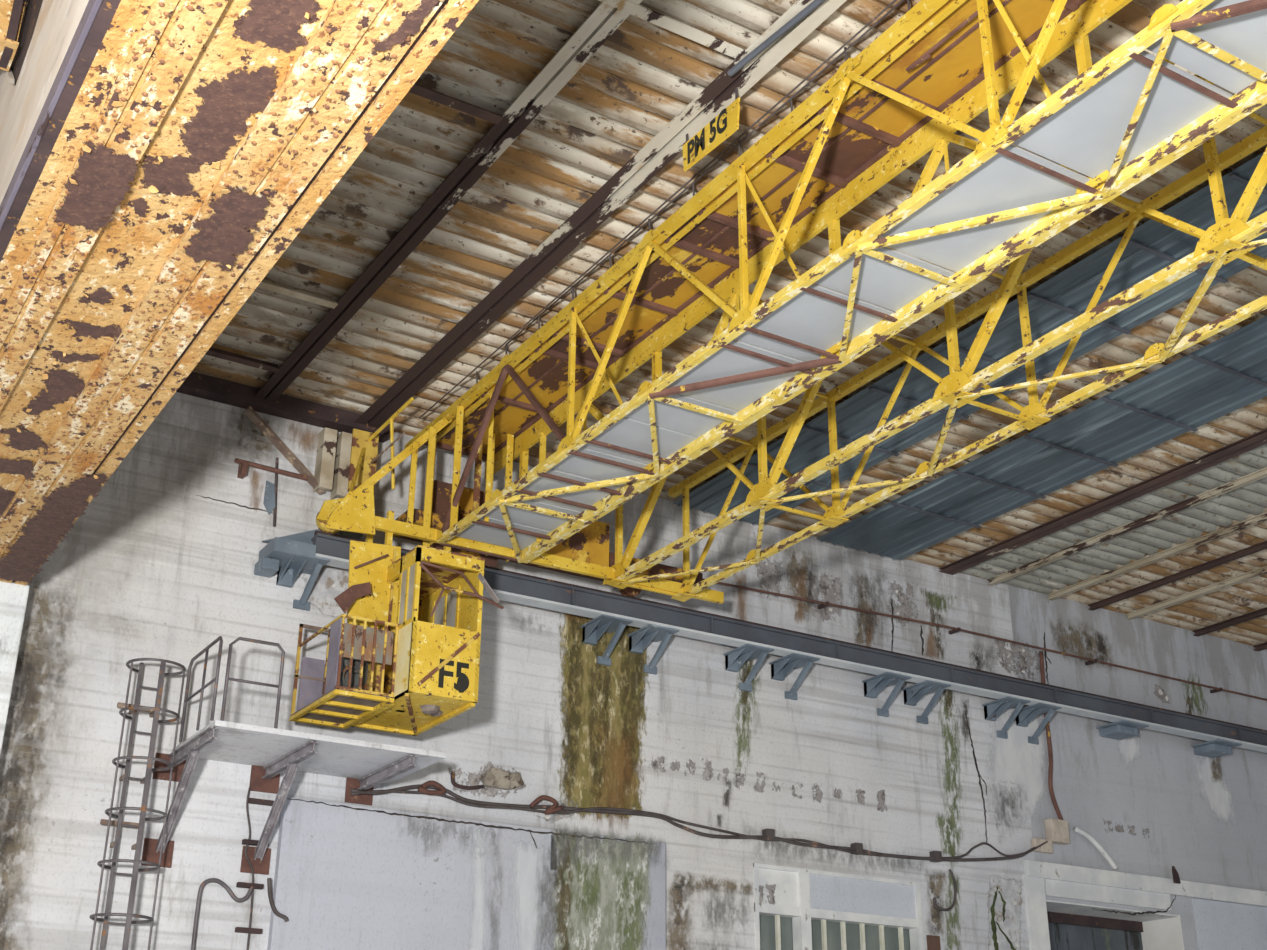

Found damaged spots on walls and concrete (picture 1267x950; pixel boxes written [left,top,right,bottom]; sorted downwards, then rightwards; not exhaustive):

peeling [232,0,323,53]
peeling [54,65,283,271]
peeling [83,287,115,305]
peeling [0,318,124,583]
damp [787,552,813,619]
damp [562,614,644,817]
damp [945,689,969,738]
damp [0,587,65,950]
damp [938,816,955,856]
damp [512,833,659,950]
damp [669,875,751,950]
damp [946,874,960,950]